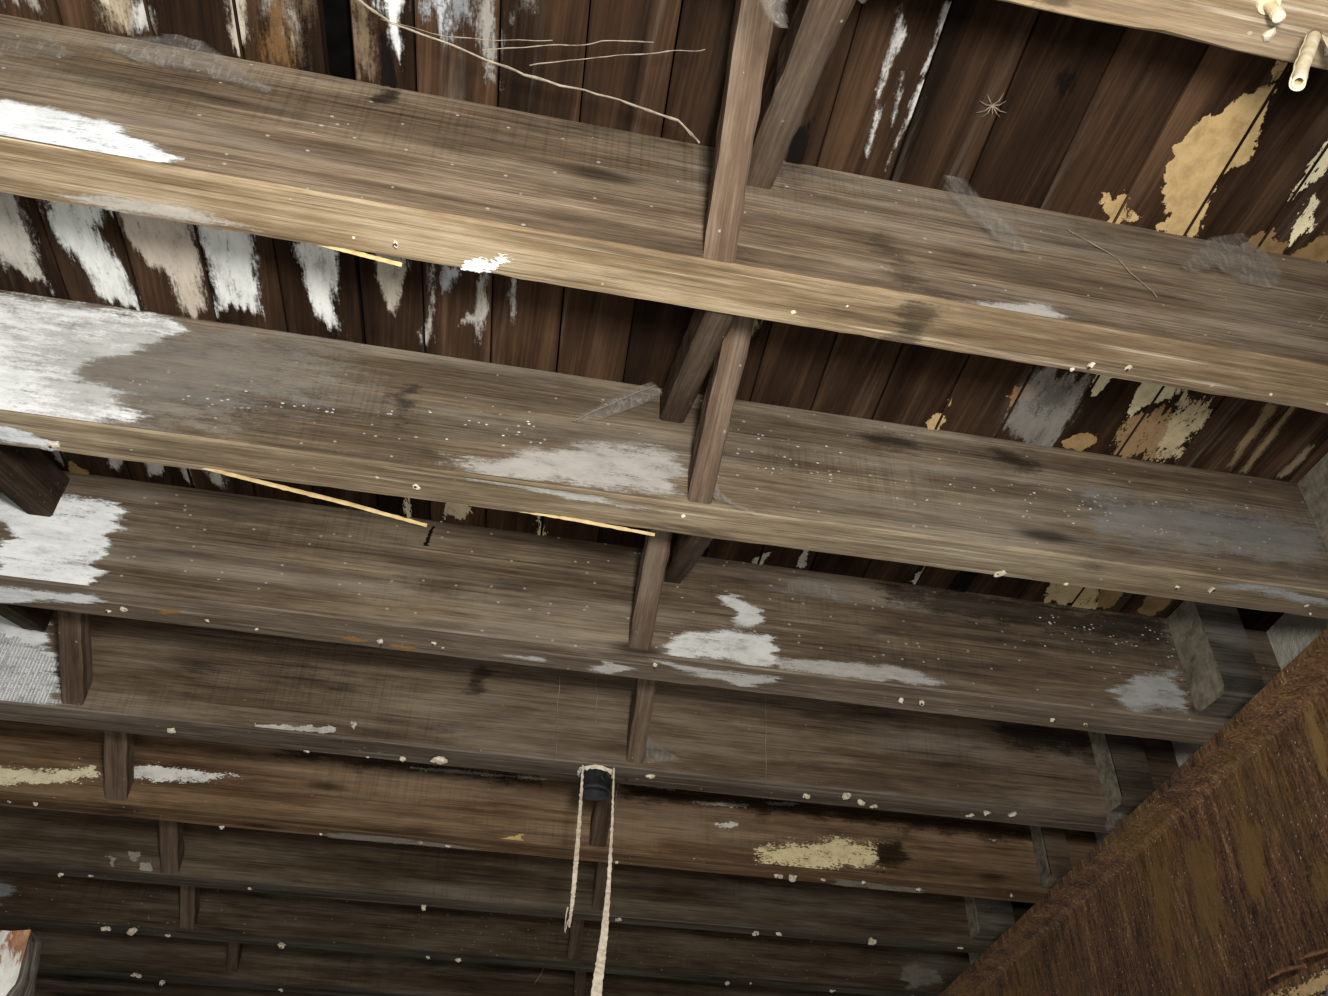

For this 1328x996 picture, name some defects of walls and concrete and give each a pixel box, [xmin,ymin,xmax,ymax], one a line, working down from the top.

peeling [1271,60,1288,82]
peeling [1291,231,1328,263]